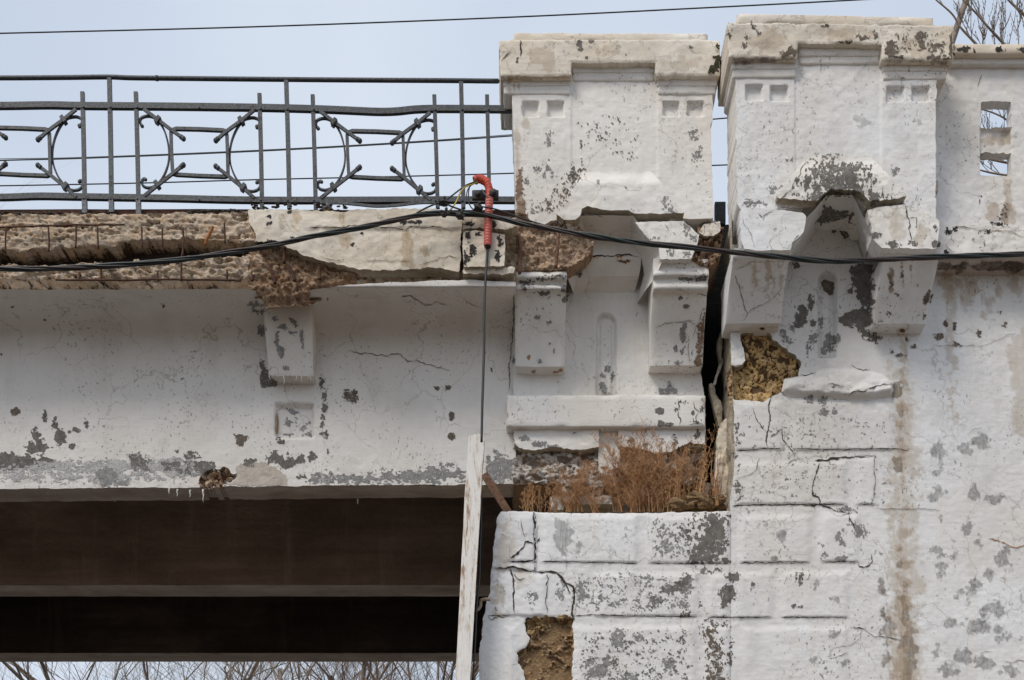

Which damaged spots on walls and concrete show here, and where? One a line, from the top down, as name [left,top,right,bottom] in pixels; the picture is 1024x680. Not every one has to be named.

spalling [0,115,638,371]
peeling [743,153,900,239]
crack [349,350,450,371]
spalling [727,263,883,403]
peeling [0,377,466,491]
crack [734,398,938,526]
peeling [517,511,755,680]
crack [488,512,898,658]
water stain [880,585,919,680]